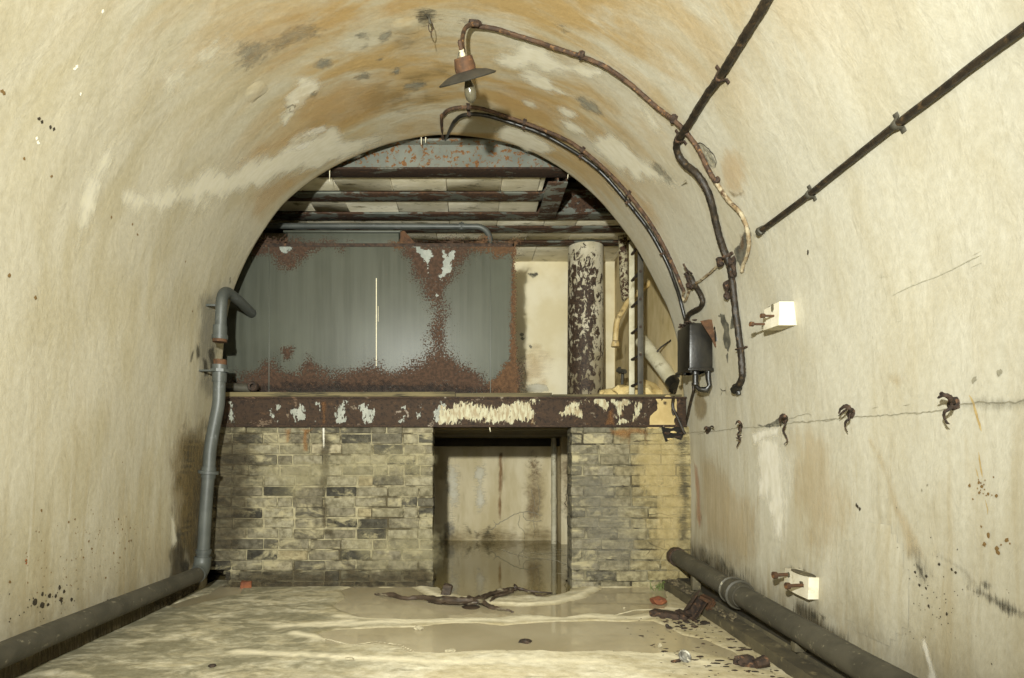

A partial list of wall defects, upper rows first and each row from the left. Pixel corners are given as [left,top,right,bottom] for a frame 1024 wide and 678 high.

corrosion [226,232,528,422]
water stain [171,439,203,576]